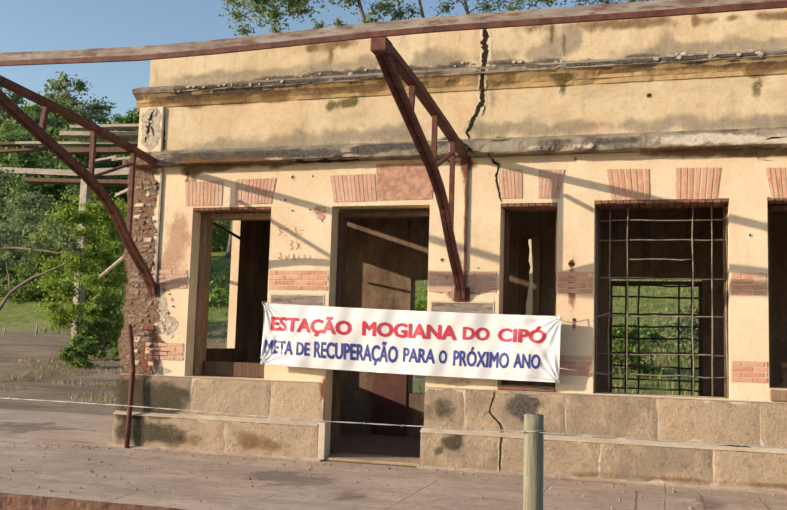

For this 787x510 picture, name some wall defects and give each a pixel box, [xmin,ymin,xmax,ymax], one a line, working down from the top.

water stain [153,41,387,111]
water stain [409,51,468,86]
water stain [503,17,787,95]
crack [437,29,502,202]
spalling [118,106,188,384]
water stain [113,378,195,446]
water stain [240,435,277,449]
water stain [435,399,451,416]
water stain [435,434,461,454]
crack [482,389,502,471]
water stain [506,394,541,422]